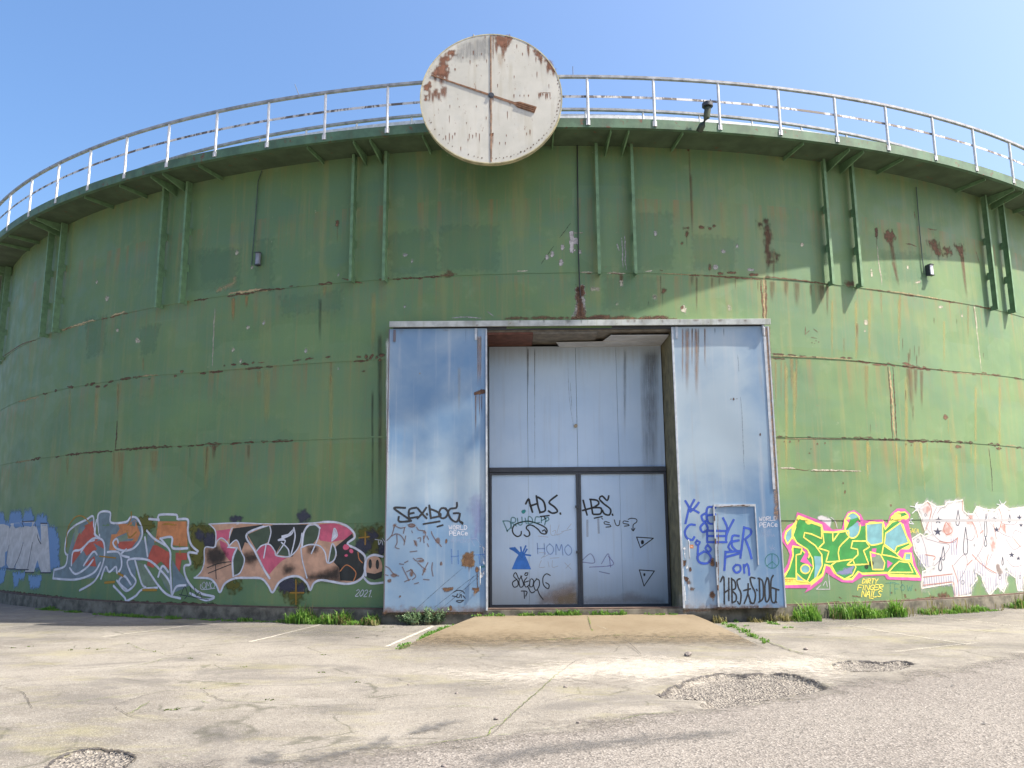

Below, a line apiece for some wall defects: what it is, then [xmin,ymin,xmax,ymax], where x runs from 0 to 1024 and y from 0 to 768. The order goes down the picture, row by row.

corrosion [424,50,456,101]
corrosion [473,34,560,121]
peeling [545,231,583,266]
corrosion [506,285,674,320]
corrosion [660,219,1001,520]
corrosion [56,426,293,458]
corrosion [461,552,479,593]